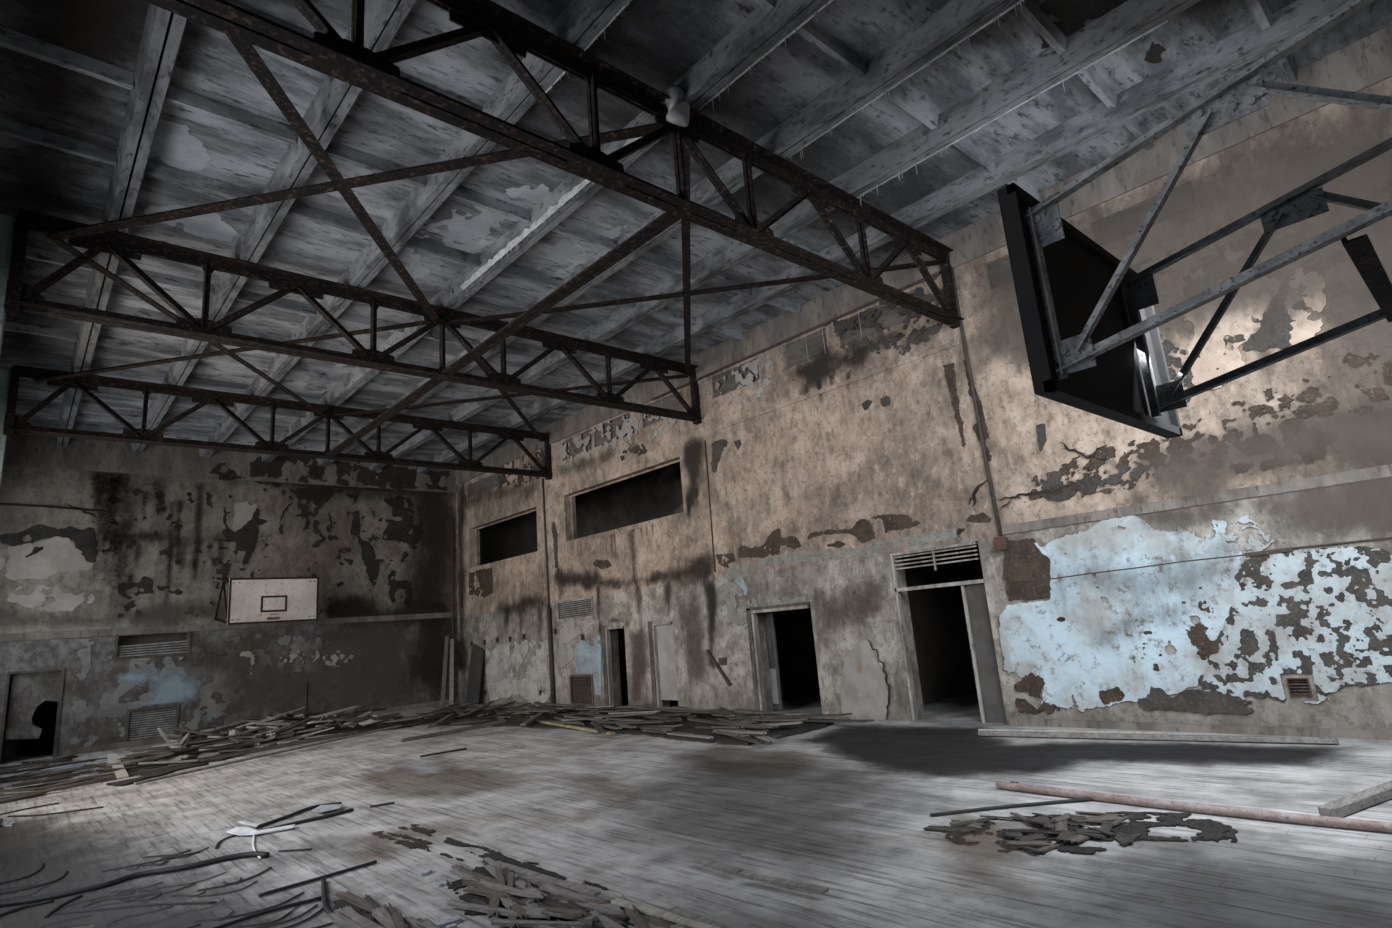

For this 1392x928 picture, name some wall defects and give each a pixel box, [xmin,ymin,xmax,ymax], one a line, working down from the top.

spalling [826,275,945,369]
peeling [1160,296,1327,402]
spalling [1016,352,1392,502]
peeling [0,487,421,618]
water stain [93,456,532,717]
peeling [716,512,991,630]
crack [868,640,890,720]
peeling [999,515,1392,715]